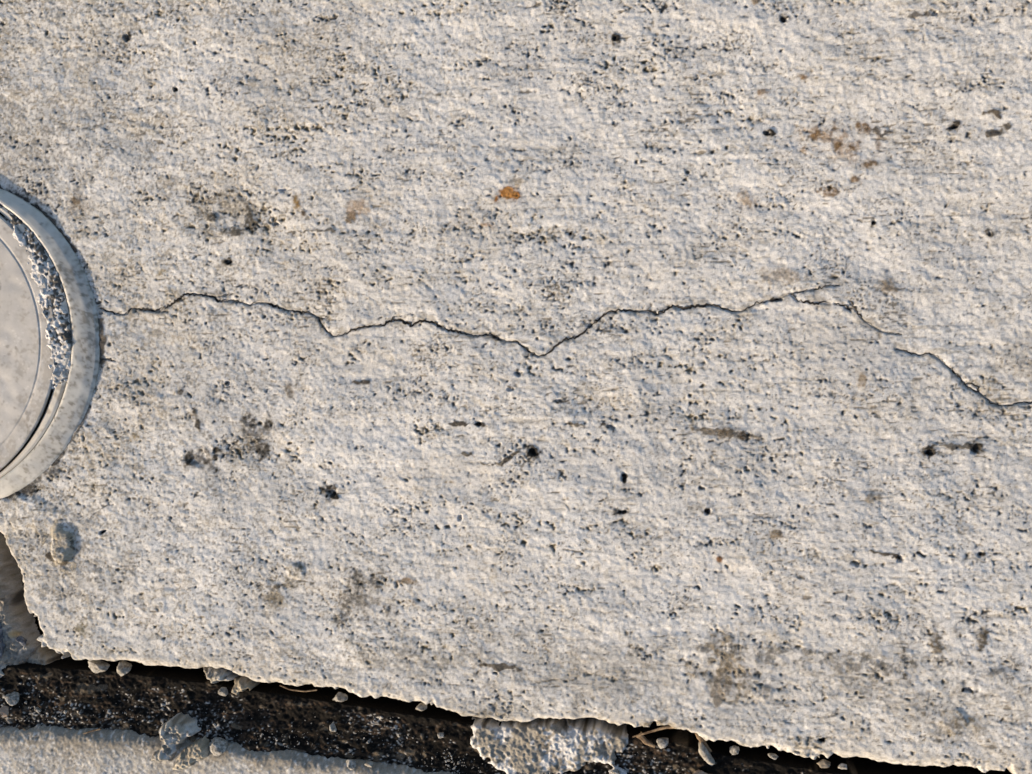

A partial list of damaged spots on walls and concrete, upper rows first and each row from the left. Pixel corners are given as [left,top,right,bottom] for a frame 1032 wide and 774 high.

crack [100,285,1032,406]